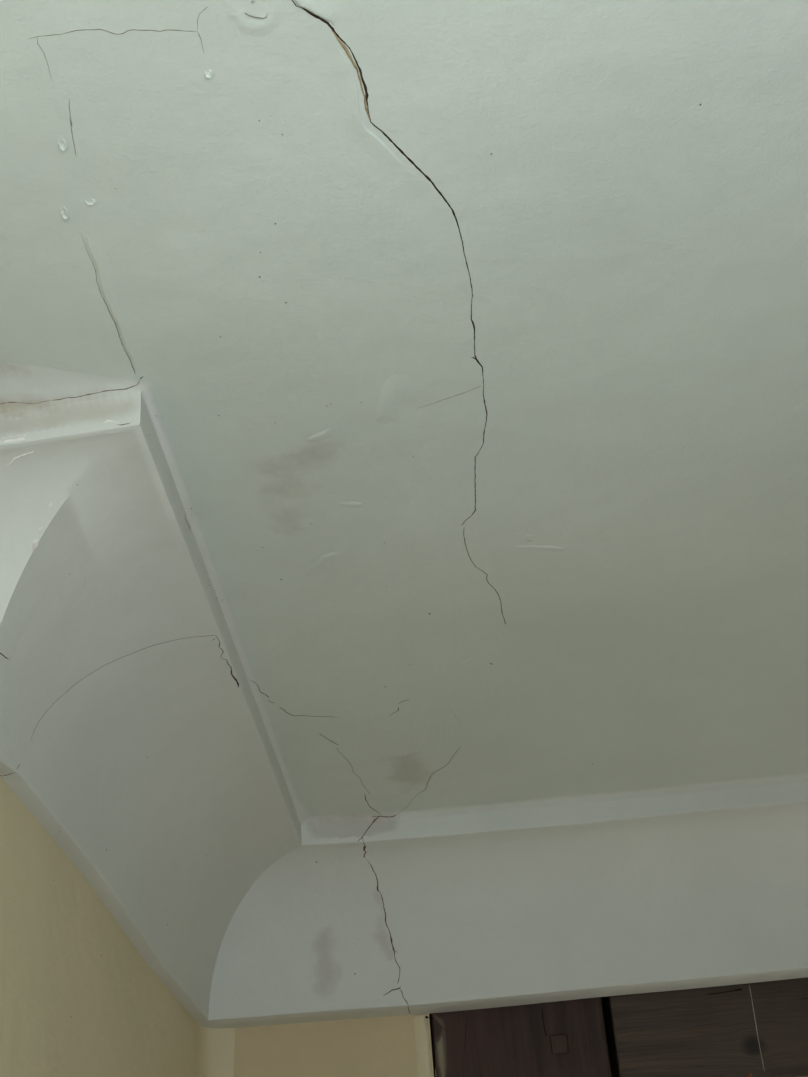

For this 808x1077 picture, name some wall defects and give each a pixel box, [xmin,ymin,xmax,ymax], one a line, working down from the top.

crack [30,7,207,52]
crack [292,0,506,624]
crack [31,635,410,1013]